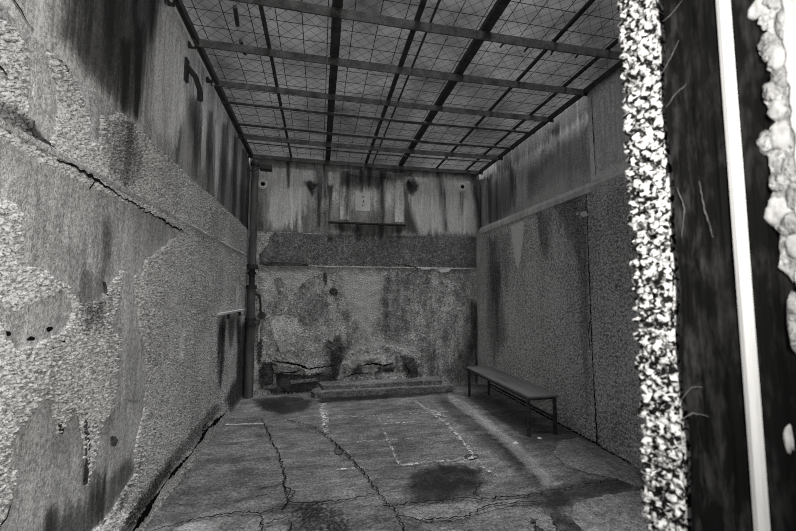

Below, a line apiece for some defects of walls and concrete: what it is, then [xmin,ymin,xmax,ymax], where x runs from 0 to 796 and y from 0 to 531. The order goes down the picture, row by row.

peeling [0,3,117,149]
damp [63,0,247,226]
damp [267,154,480,235]
flaking render [259,253,308,266]
peeling [0,132,178,531]
flaking render [257,333,344,395]
peeling [270,273,338,353]
crack [272,360,408,378]
crack [490,195,630,464]
damp [292,502,349,531]
crack [132,411,617,531]
damp [410,465,482,501]